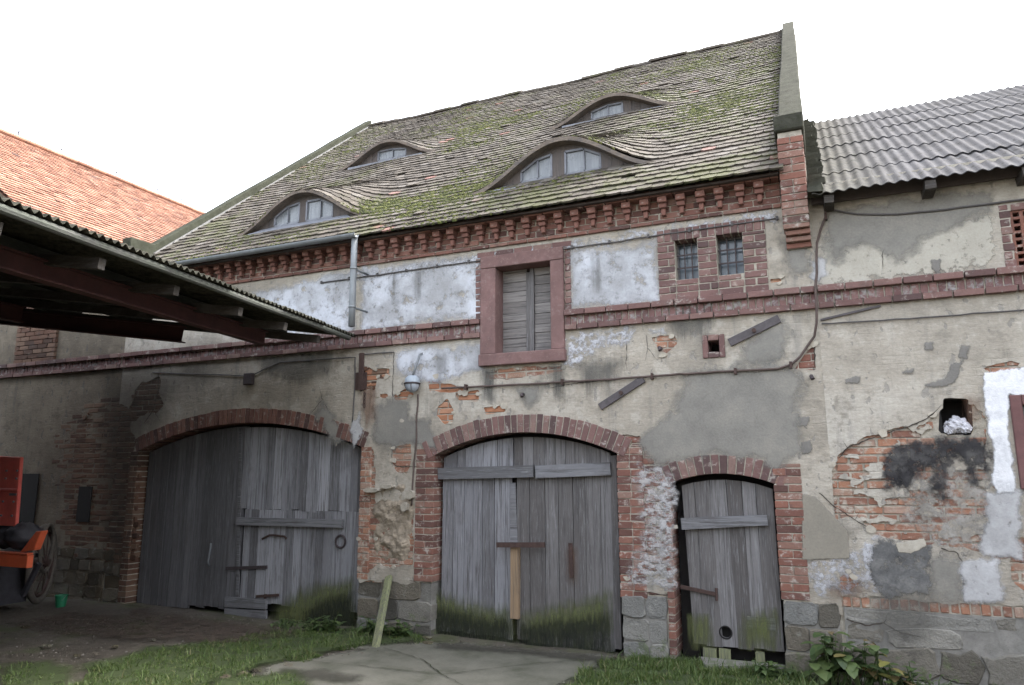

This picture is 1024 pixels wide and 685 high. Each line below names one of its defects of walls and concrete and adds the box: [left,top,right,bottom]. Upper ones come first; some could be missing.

peeling [361,326,635,424]
spalling [652,328,677,358]
spalling [795,340,818,370]
spalling [121,377,163,427]
spalling [356,449,414,583]
spalling [390,444,412,474]
peeling [623,436,678,595]
spalling [809,398,995,607]
water stain [928,462,947,500]
water stain [967,465,978,486]